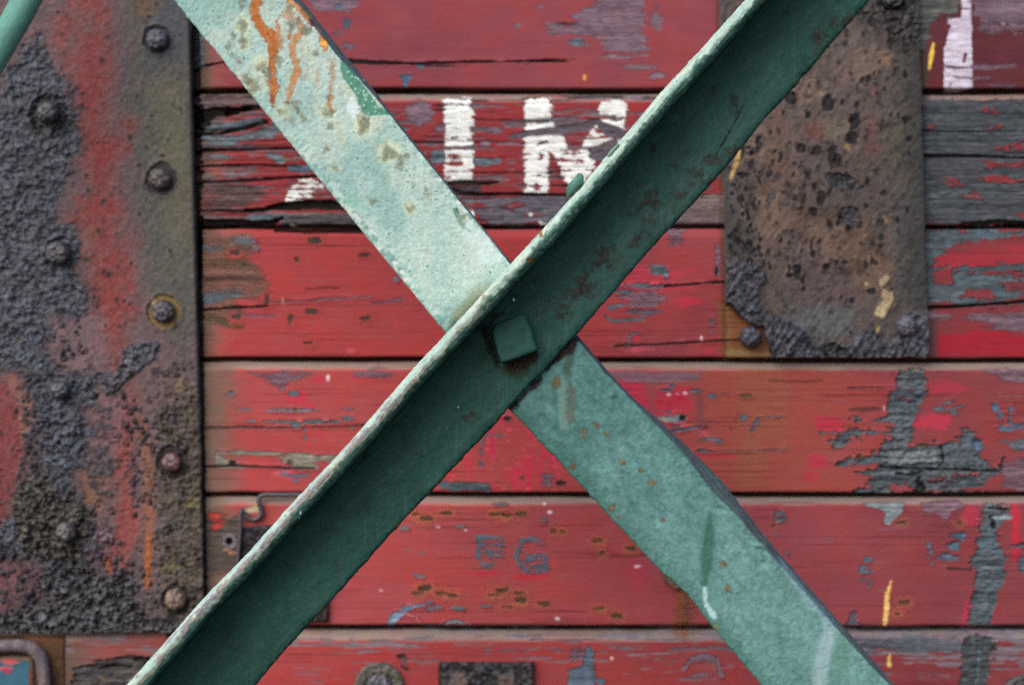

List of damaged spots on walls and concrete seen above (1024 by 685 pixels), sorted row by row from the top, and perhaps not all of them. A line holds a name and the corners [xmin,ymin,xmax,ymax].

rust [250,0,328,104]
peeling [544,0,666,79]
rust [858,0,920,52]
peeling [918,0,1024,56]
crack [195,148,317,185]
rust [824,173,862,192]
peeling [921,64,1024,331]
rust [0,34,179,634]
rust [726,260,929,358]
peeling [818,368,1024,685]